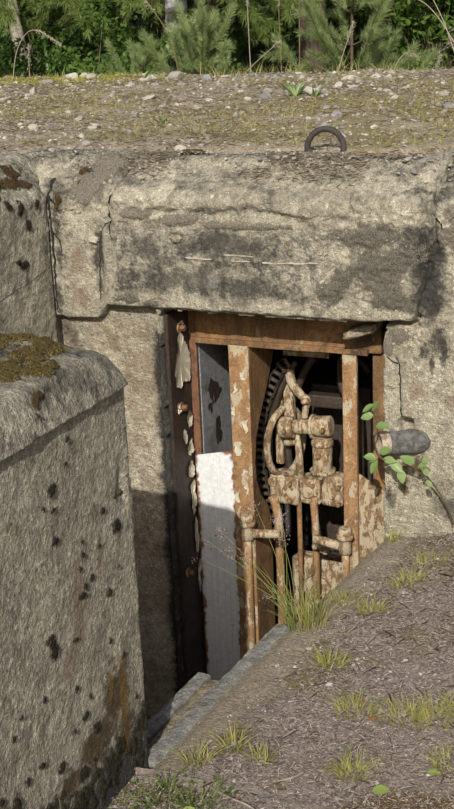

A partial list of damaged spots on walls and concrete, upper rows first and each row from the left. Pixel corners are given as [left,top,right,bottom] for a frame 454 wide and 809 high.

crack [3,170,129,311]
crack [417,207,443,319]
peeling [175,320,191,388]
damp [419,294,450,372]
peeling [207,378,222,446]
peeling [177,403,202,591]
rust [62,655,135,800]